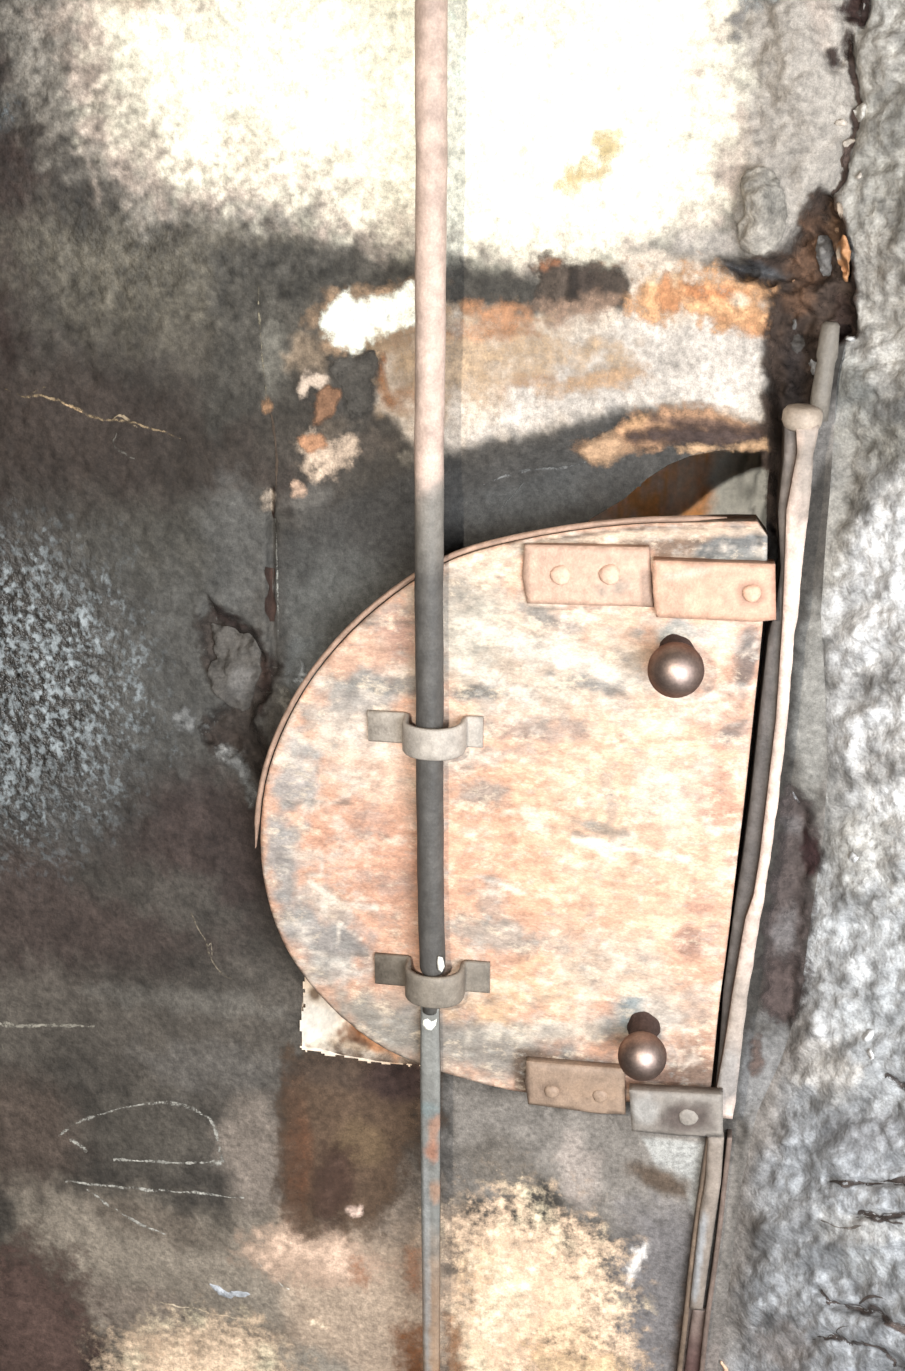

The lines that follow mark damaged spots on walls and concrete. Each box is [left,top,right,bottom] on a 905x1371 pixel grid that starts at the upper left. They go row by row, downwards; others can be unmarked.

crack [826,0,871,196]
flaking render [261,279,415,510]
spalling [725,187,860,532]
water stain [0,548,143,832]
crack [885,1073,905,1089]
crack [821,1176,905,1229]
crack [813,1290,905,1367]